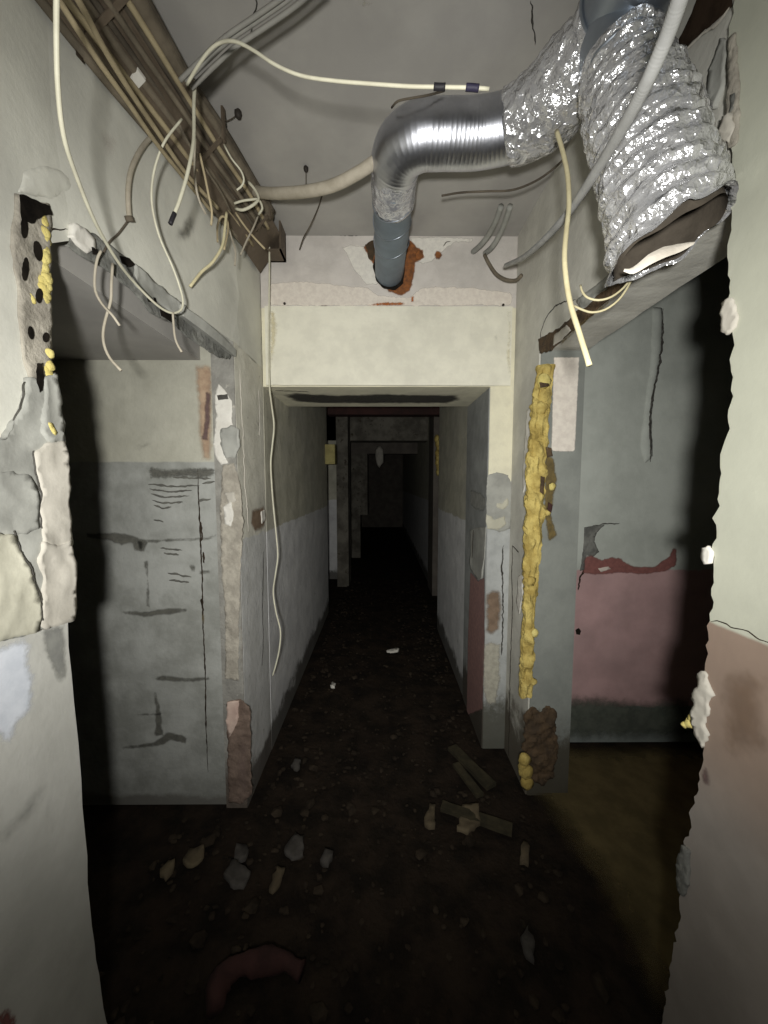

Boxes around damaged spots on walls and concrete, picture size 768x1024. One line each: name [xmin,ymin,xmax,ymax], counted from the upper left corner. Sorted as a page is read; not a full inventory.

peeling [270,245,512,306]
corrosion [364,240,442,305]
peeling [411,237,473,263]
flaking render [0,193,236,739]
peeling [467,408,531,714]
peeling [578,523,677,590]
crack [198,479,208,767]
flaking render [226,699,253,804]